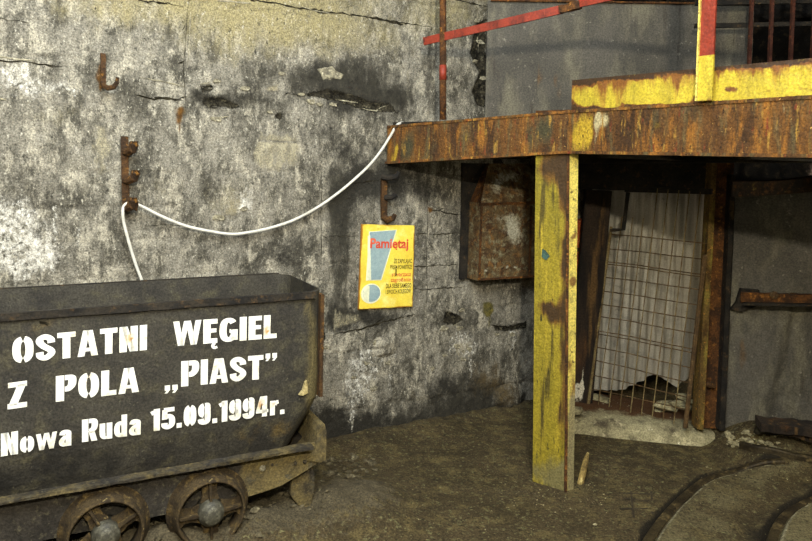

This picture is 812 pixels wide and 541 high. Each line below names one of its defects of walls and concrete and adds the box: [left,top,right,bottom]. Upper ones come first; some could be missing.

crack [217,0,433,28]
crack [0,56,54,68]
crack [137,0,191,104]
spalling [285,66,398,113]
leakage [449,331,478,379]
leakage [346,348,388,431]